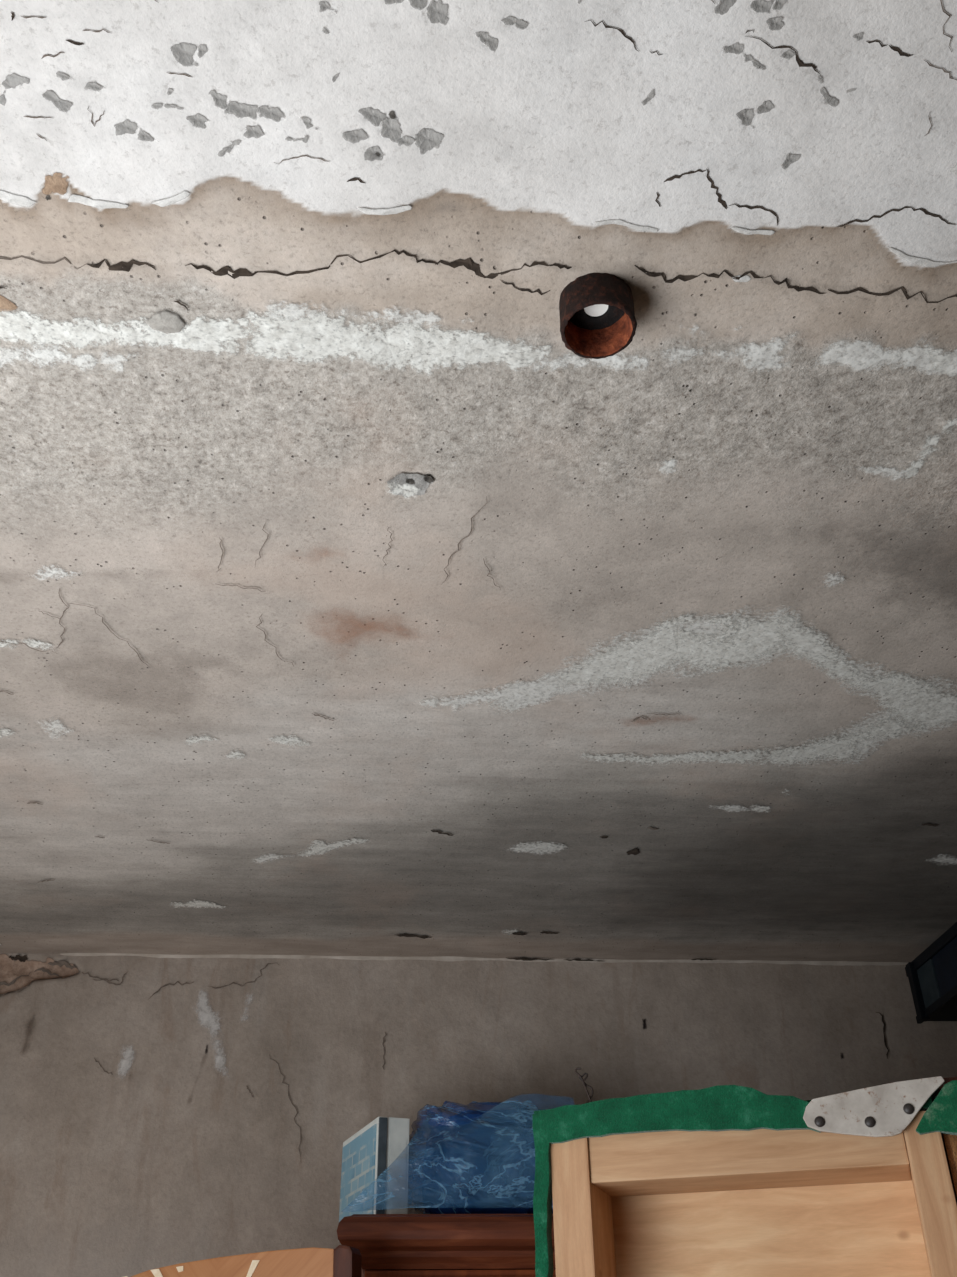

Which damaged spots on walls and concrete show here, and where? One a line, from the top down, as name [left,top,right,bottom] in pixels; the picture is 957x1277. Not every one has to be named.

flaking render [171,43,207,66]
flaking render [209,90,285,157]
flaking render [343,107,444,161]
peeling [0,173,128,209]
crack [655,169,778,225]
crack [837,207,955,227]
crack [0,250,572,296]
crack [634,265,957,303]
leakage [0,301,648,376]
leakage [665,335,794,370]
leakage [816,341,957,376]
leakage [421,608,957,765]